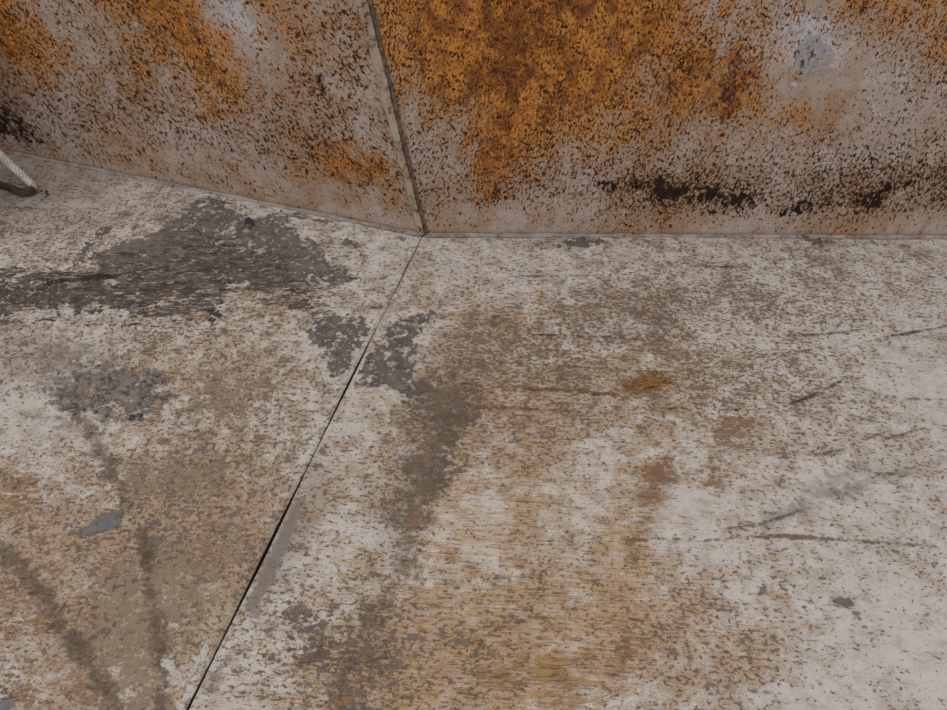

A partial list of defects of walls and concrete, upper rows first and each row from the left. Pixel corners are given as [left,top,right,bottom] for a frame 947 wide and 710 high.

rust [0,100,46,148]
rust [121,0,239,118]
rust [294,28,333,120]
rust [312,133,399,196]
rust [399,0,780,208]
rust [597,172,757,216]
rust [779,174,930,234]
water stain [35,343,159,428]
rust [620,412,760,570]
rust [448,586,640,710]